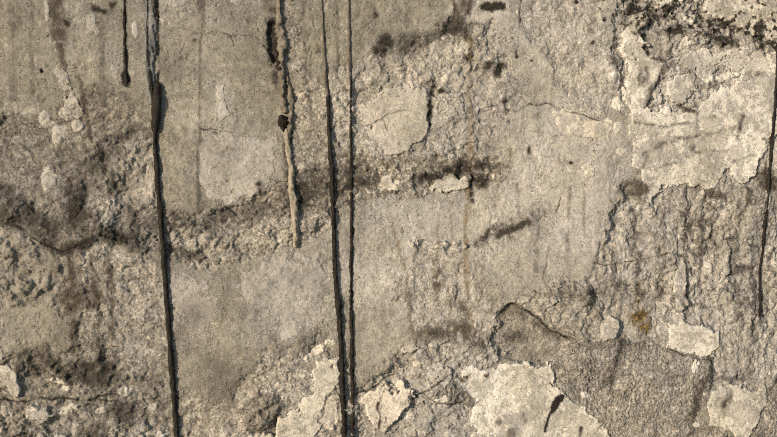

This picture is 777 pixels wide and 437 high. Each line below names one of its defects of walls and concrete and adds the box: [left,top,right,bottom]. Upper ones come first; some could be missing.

damp [268,21,278,63]
damp [620,0,777,106]
spalling [0,0,605,437]
spalling [458,0,777,437]
crack [503,302,568,339]